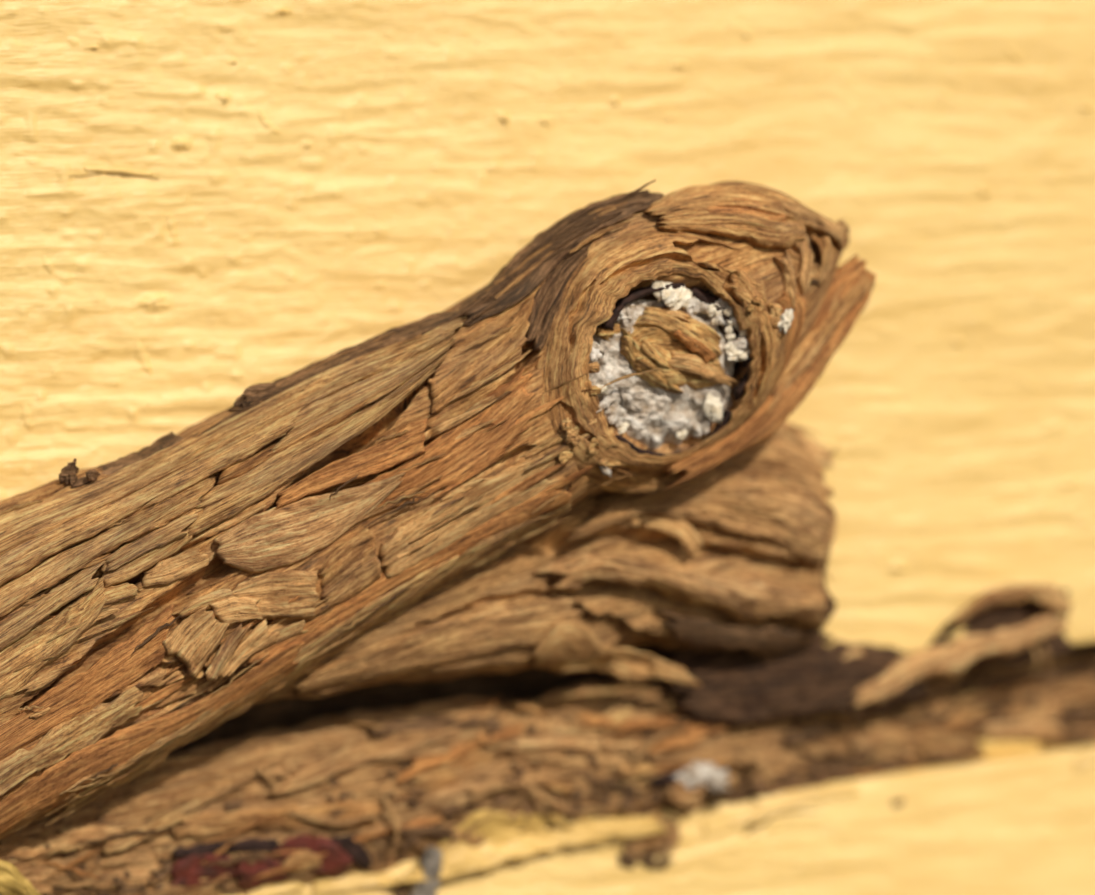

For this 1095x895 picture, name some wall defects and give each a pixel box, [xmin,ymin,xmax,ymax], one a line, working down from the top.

peeling [662,583,1074,728]
peeling [976,740,1041,759]
peeling [1073,746,1095,770]